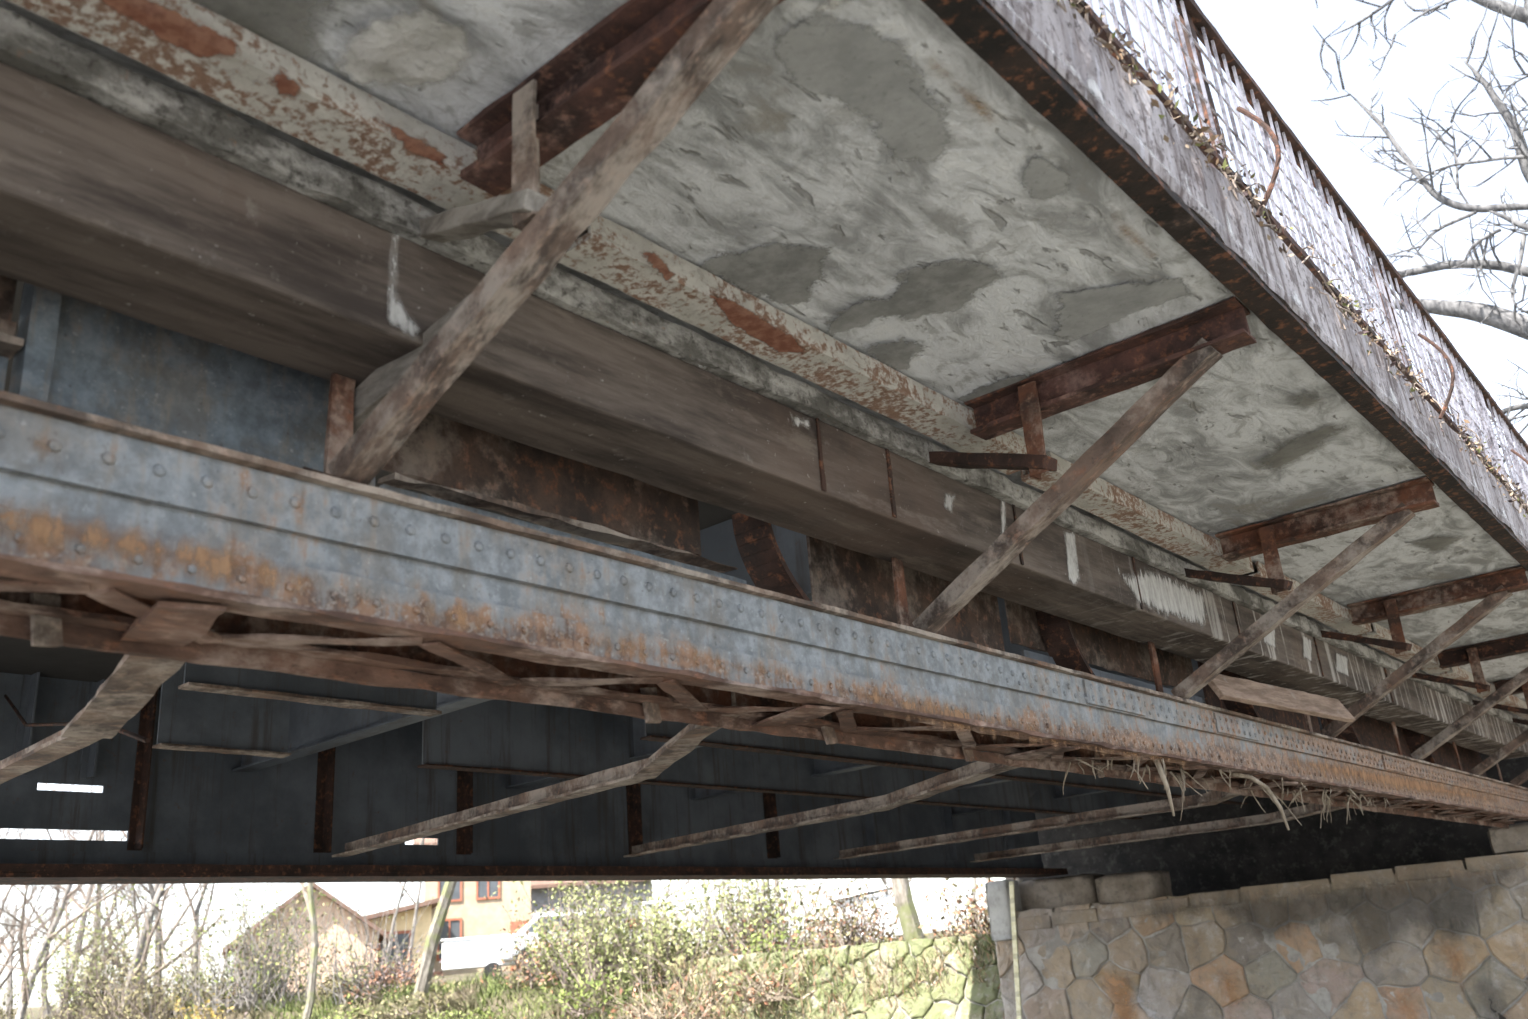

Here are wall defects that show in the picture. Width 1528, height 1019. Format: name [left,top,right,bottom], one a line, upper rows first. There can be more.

peeling [103,0,239,58]
peeling [270,70,301,97]
peeling [336,8,470,87]
peeling [375,117,447,169]
rust [0,505,301,589]
rust [867,689,1186,764]